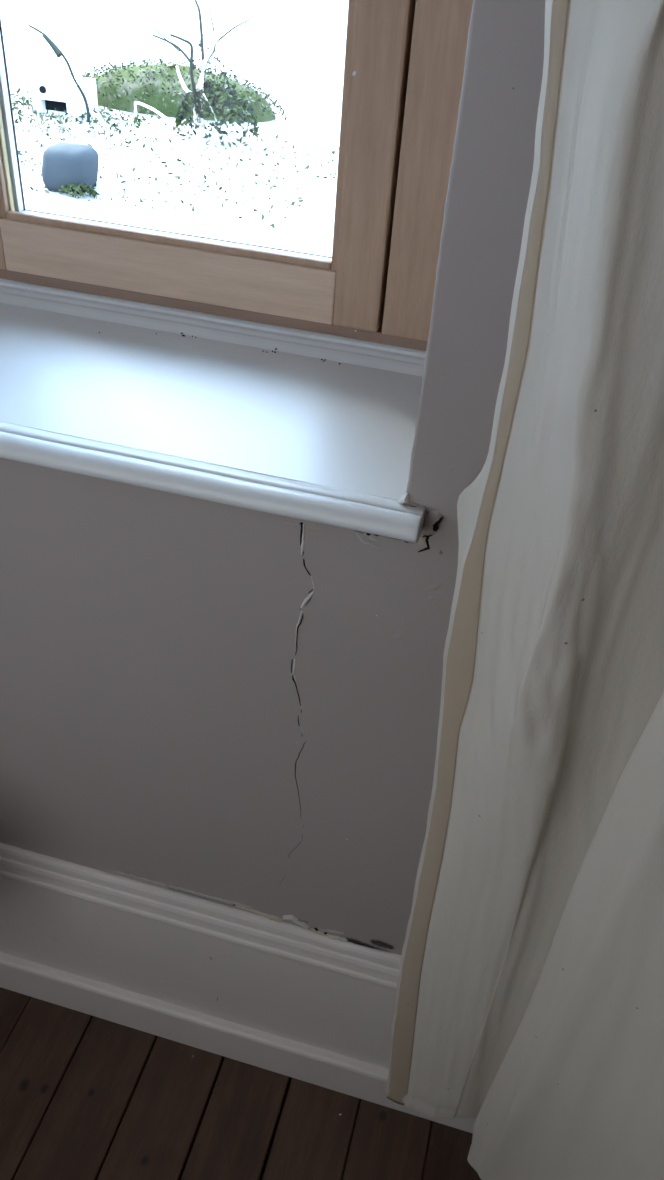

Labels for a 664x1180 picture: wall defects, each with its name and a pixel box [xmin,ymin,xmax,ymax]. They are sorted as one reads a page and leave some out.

crack [291,522,315,844]